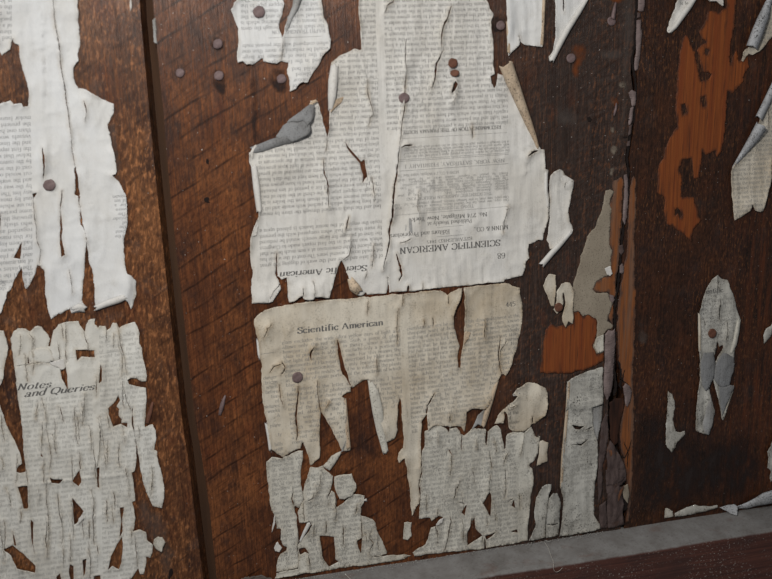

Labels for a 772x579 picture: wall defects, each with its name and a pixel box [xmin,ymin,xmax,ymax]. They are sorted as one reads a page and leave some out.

peeling [506,0,588,62]
crack [623,0,638,199]
peeling [657,0,750,242]
peeling [266,169,637,579]
crack [613,222,631,396]
peeling [153,537,165,552]